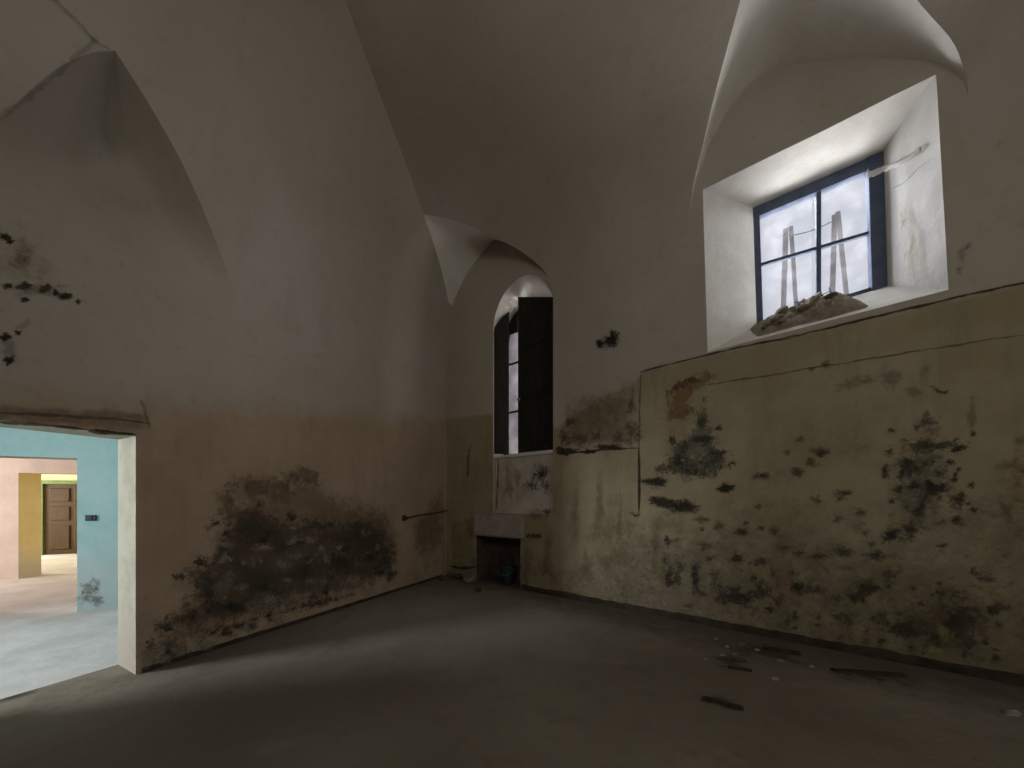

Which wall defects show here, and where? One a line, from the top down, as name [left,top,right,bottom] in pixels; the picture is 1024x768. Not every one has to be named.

water stain [656,398,734,482]
crack [556,282,1024,517]
water stain [142,503,398,665]
water stain [663,535,897,625]